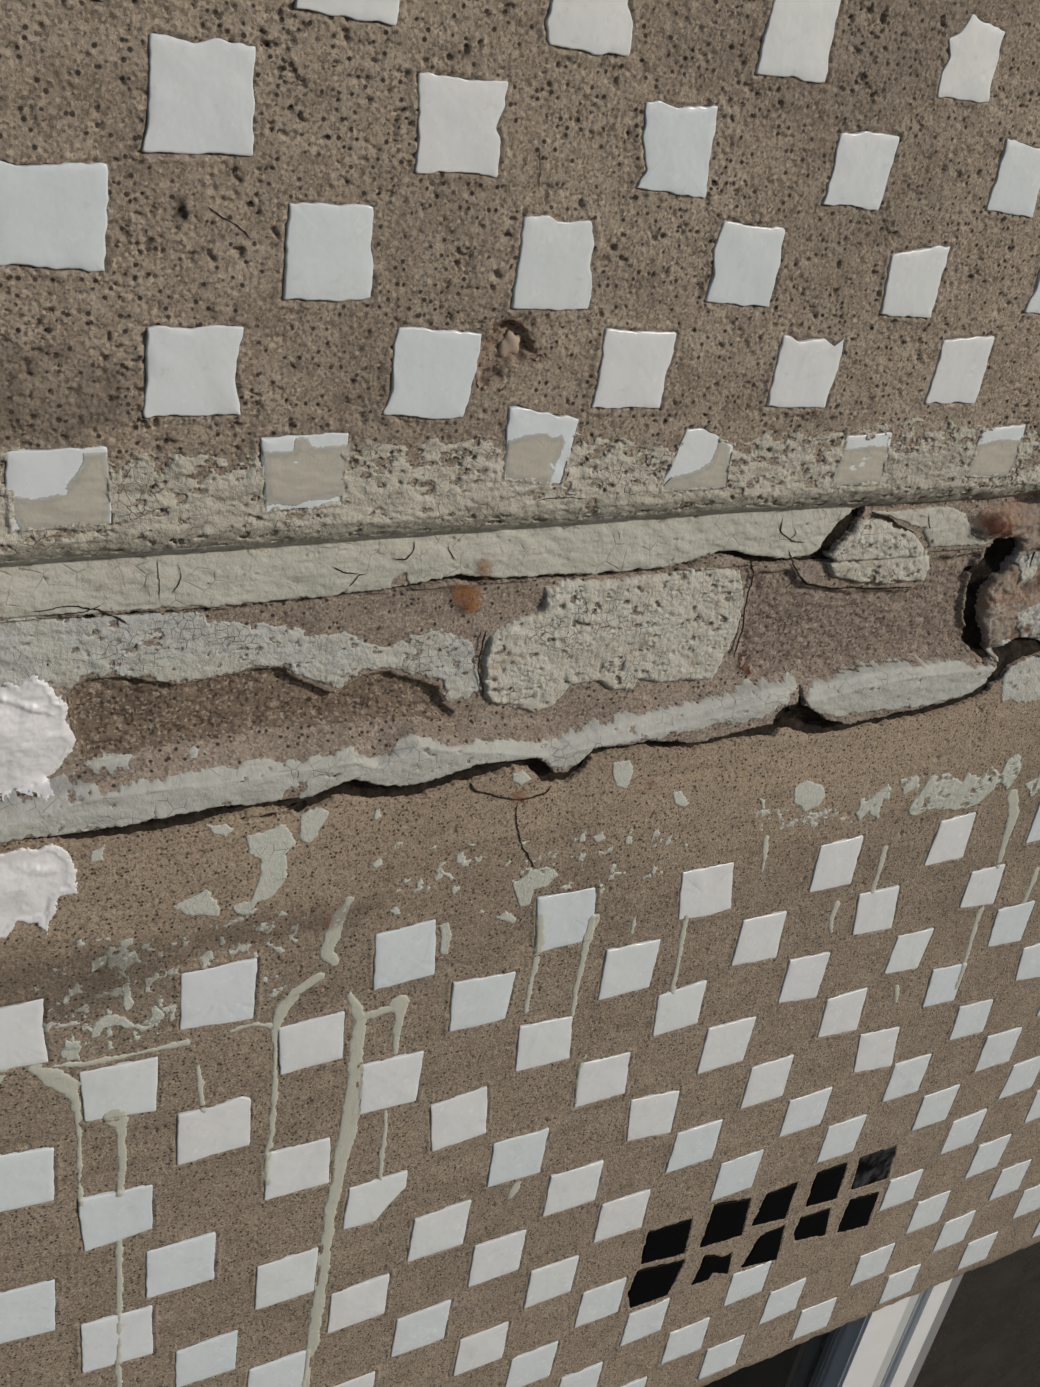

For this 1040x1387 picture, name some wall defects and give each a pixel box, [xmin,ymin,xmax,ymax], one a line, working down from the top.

spalling [475,316,548,392]
crack [681,508,931,657]
corrosion [979,512,1014,538]
peeling [0,416,1040,1061]
crack [29,537,1040,867]